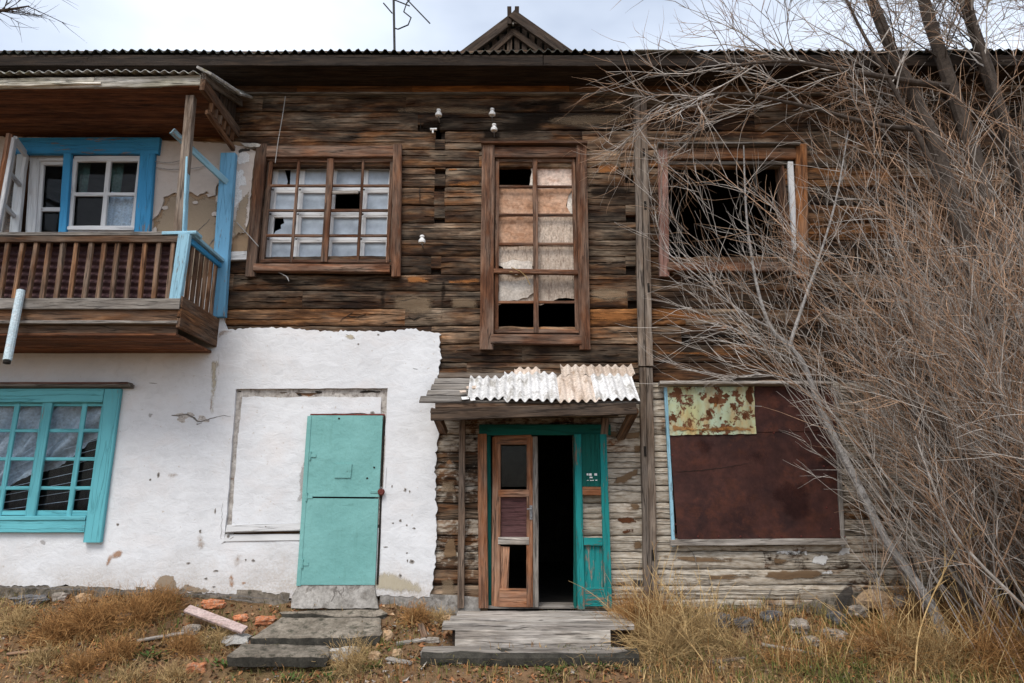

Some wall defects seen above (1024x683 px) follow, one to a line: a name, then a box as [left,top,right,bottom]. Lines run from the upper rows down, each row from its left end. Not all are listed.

peeling [153,193,218,276]
peeling [233,142,261,237]
crack [171,412,230,425]
corrosion [670,386,841,539]